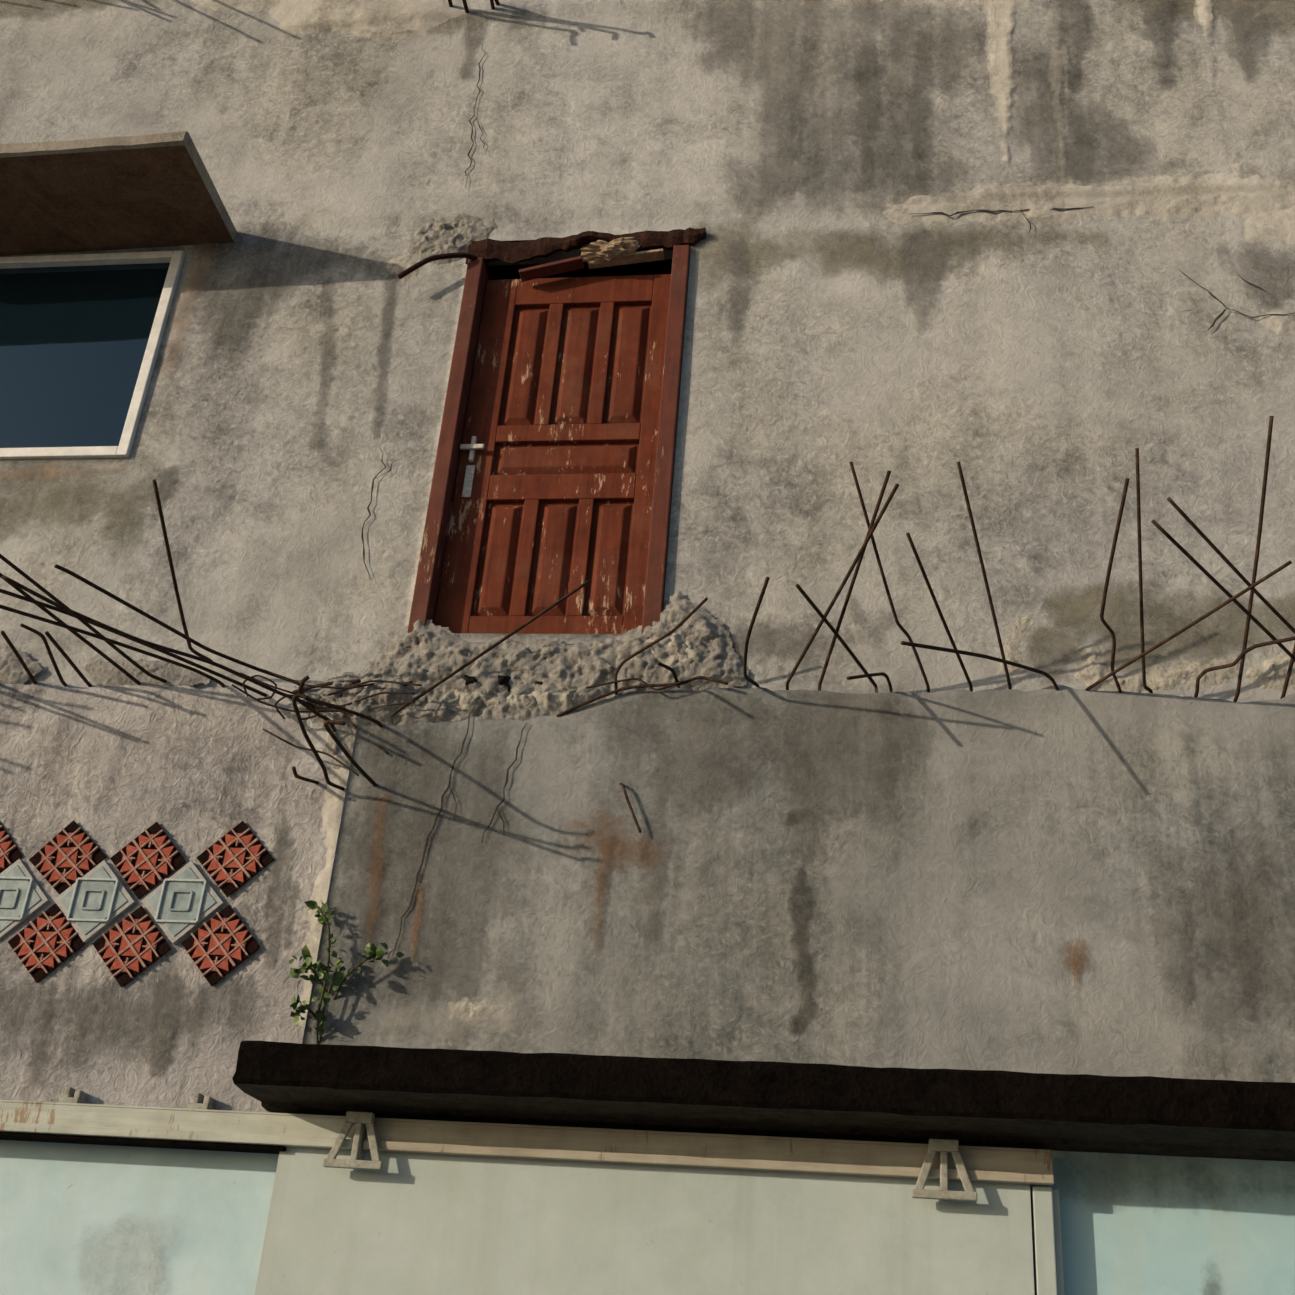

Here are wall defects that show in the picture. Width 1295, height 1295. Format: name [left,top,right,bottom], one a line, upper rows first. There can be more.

crack [465,44,486,189]
damp [694,0,1140,213]
damp [1124,0,1295,85]
spalling [385,213,498,285]
damp [814,227,1053,314]
crack [915,206,1093,234]
crack [1178,269,1294,330]
spalling [0,479,770,791]
crack [393,707,475,955]
crack [482,723,527,843]
damp [644,688,924,943]
damp [791,869,815,1033]